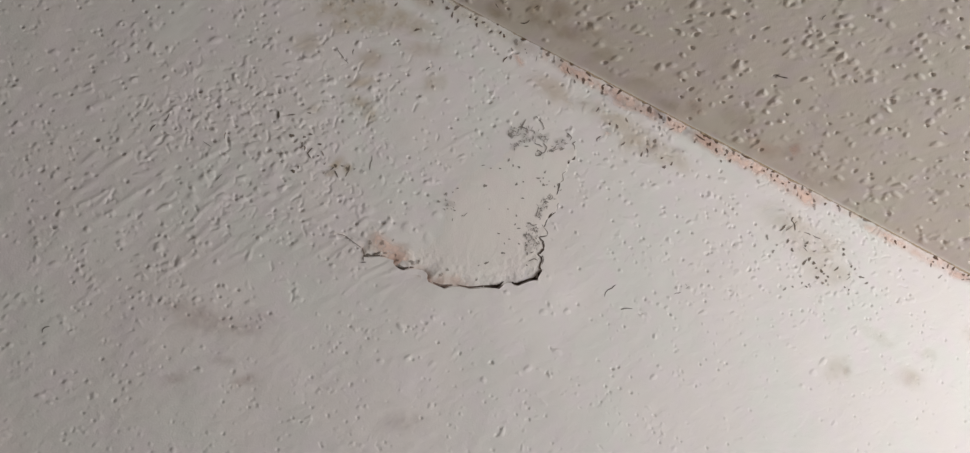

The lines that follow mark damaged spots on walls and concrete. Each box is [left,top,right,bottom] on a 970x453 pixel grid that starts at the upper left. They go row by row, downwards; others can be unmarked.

peeling [333,141,579,307]
crack [482,116,572,266]